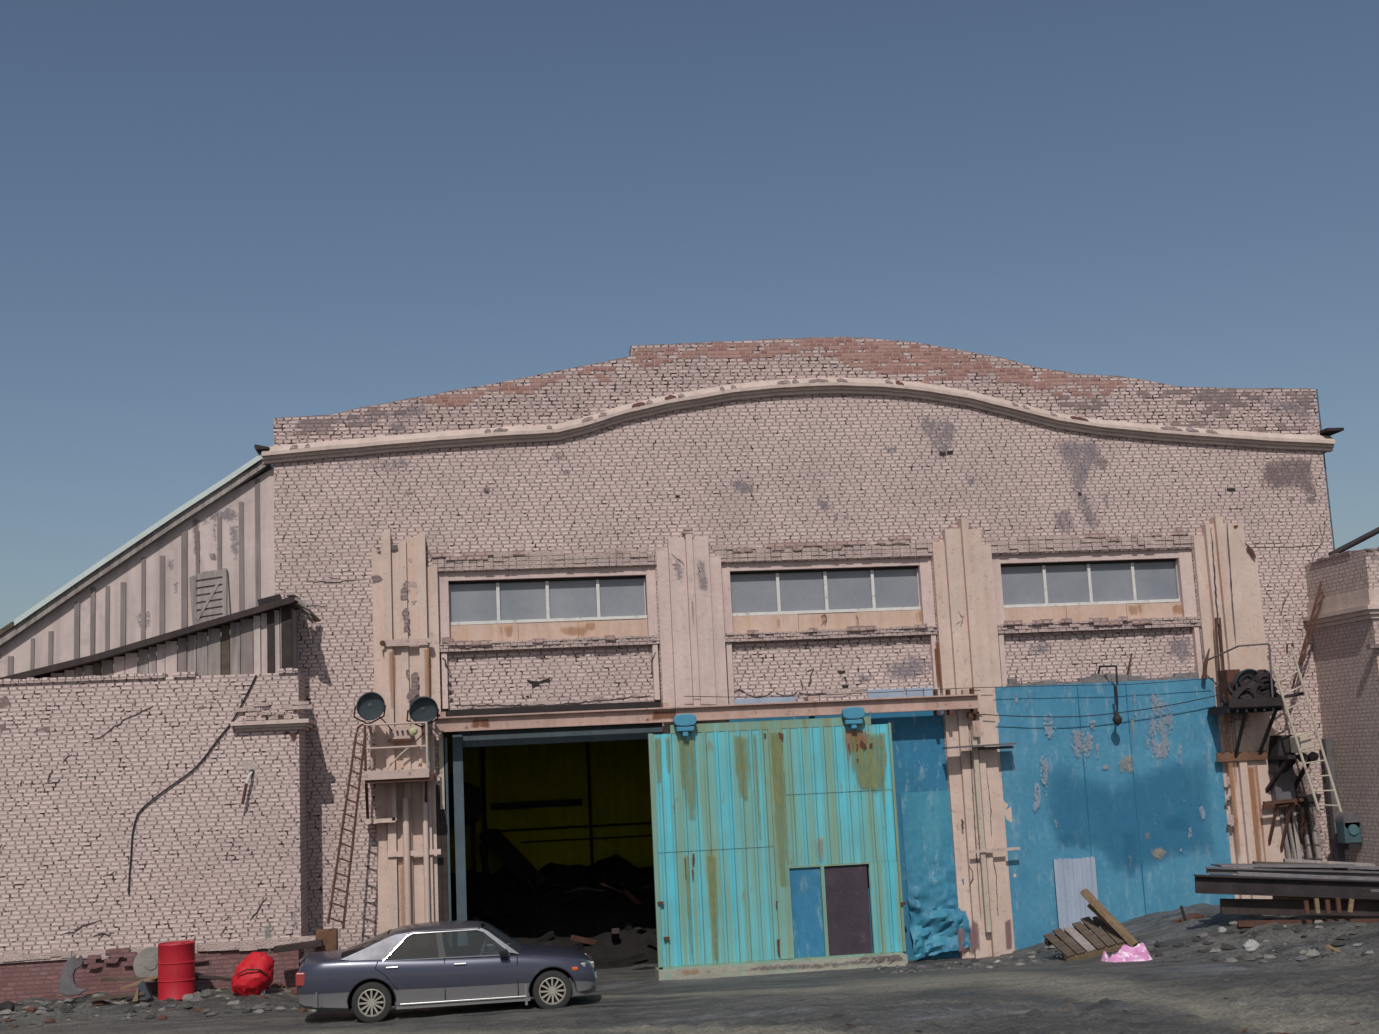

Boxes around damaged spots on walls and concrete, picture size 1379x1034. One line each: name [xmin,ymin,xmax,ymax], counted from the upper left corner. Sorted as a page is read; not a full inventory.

peeling [290,366,615,449]
peeling [631,338,1265,433]
peeling [1253,391,1316,433]
water stain [1056,442,1108,533]
water stain [1264,458,1315,503]
rust [655,738,695,817]
rust [736,733,786,885]
rust [846,730,886,822]
peeling [1033,714,1132,811]
peeling [1131,693,1182,764]
rust [708,855,718,958]